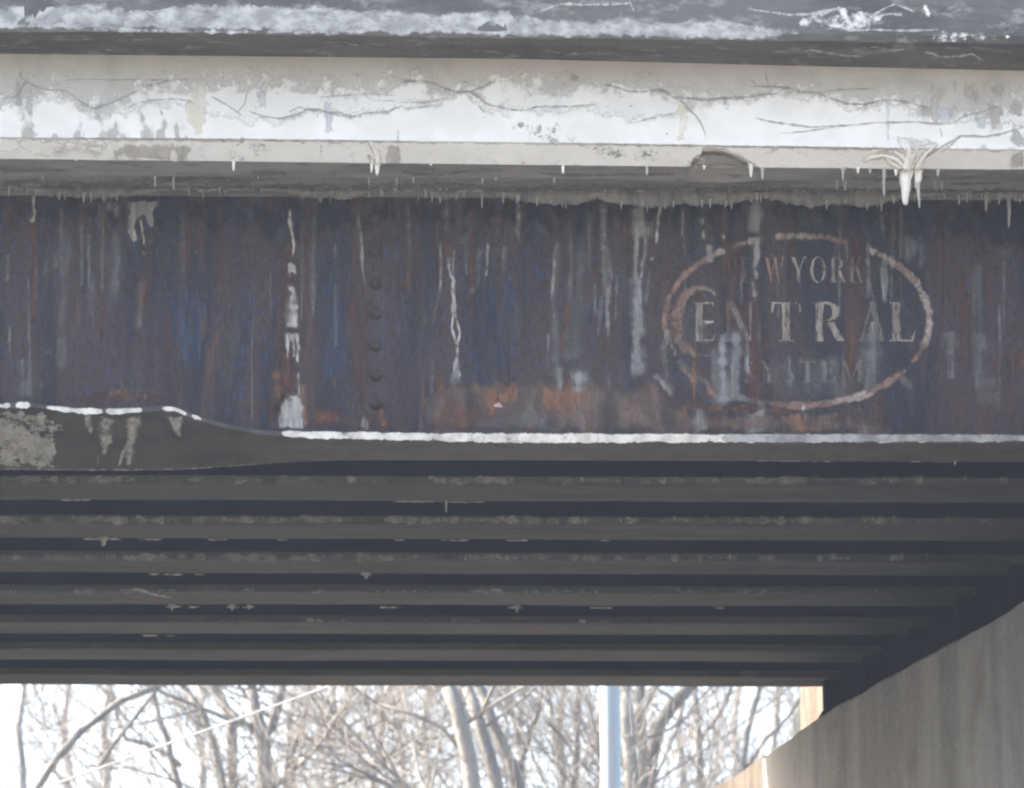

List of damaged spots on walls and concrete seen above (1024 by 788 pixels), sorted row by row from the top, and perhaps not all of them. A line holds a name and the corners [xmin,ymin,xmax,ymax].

crack [13,73,588,142]
crack [561,76,1014,157]
water stain [0,66,1024,444]
rust [273,244,307,428]
rust [420,300,891,434]